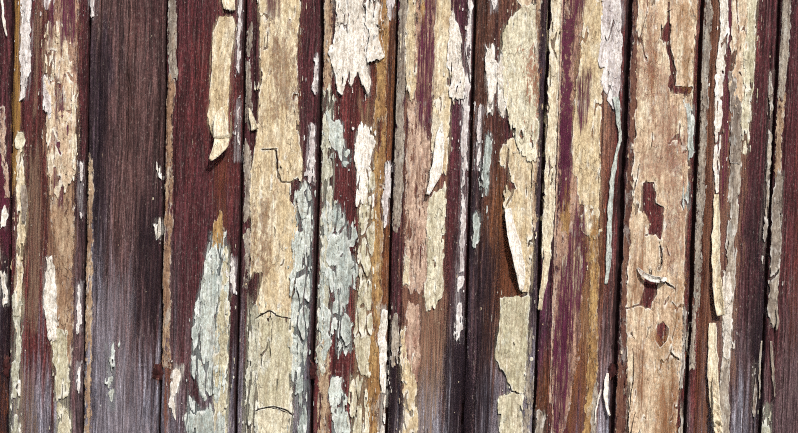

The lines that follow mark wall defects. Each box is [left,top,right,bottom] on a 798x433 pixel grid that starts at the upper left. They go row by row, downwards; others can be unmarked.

peeling [0,106,27,433]
peeling [14,0,101,433]
peeling [105,339,120,412]
crack [256,310,291,342]
peeling [153,0,791,433]